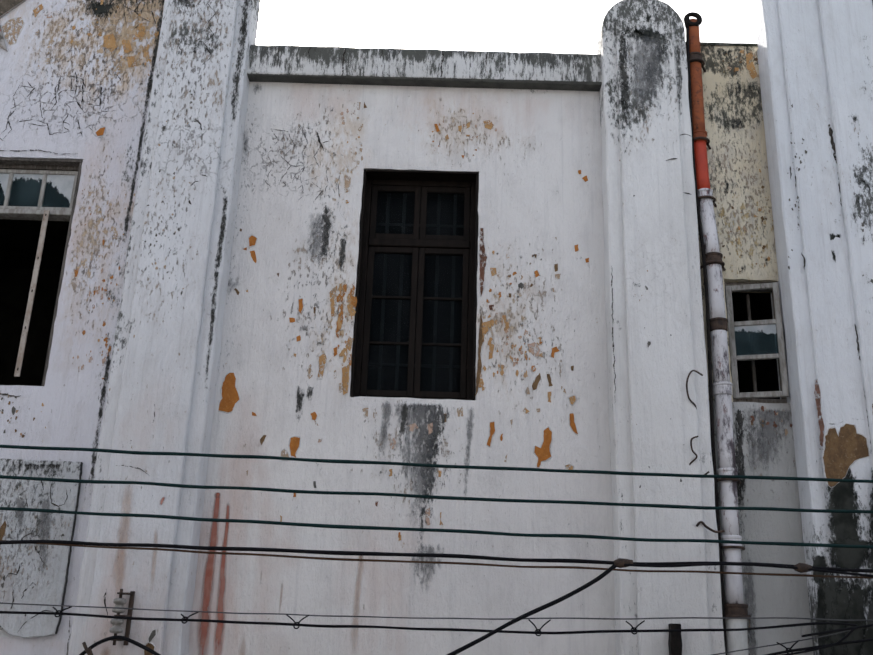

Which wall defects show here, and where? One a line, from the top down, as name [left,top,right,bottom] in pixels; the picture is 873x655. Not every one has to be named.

crack [0,72,121,155]
leakage [231,0,249,119]
crack [266,126,340,203]
leakage [619,15,683,136]
leakage [206,197,227,380]
peeling [218,372,241,414]
peeling [307,283,357,395]
leakage [381,404,449,528]
peeling [475,227,578,435]
peeling [814,380,870,488]
rust [200,493,229,655]
leakage [812,469,873,655]